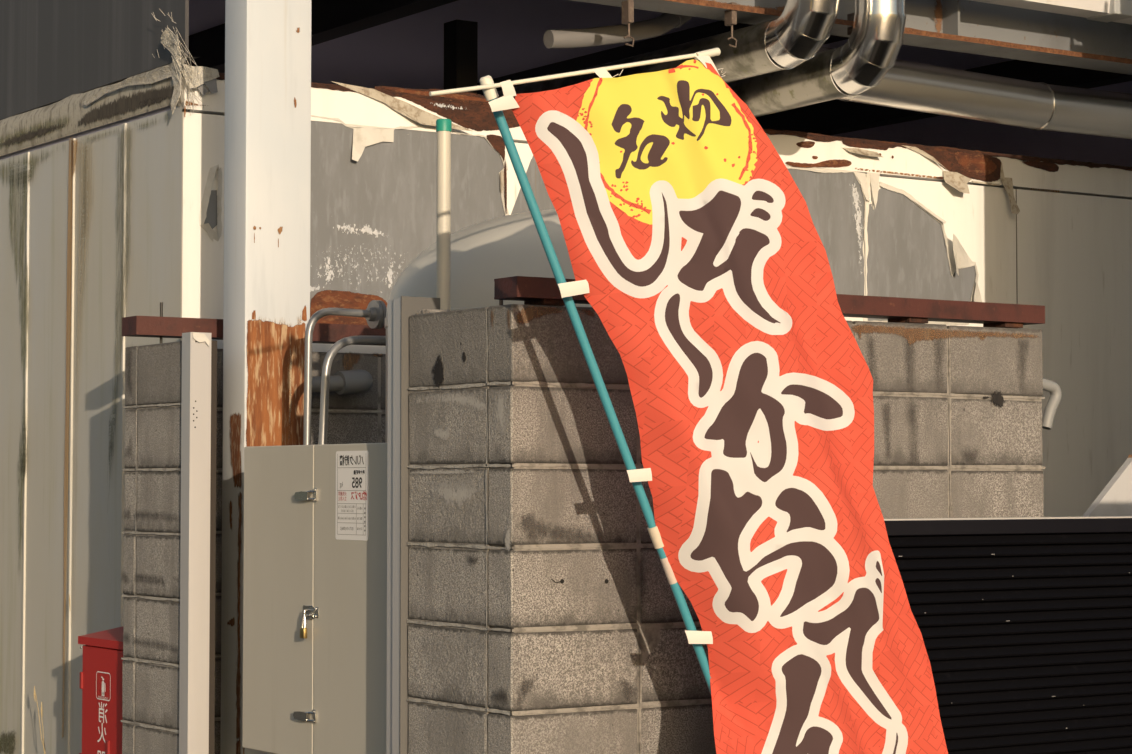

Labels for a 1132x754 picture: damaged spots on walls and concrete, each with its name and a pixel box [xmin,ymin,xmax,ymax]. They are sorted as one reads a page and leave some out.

damp [0,123,65,146]
damp [77,143,89,345]
damp [79,84,174,125]
peeling [199,164,222,241]
peeling [310,115,437,307]
peeling [451,131,555,234]
peeling [785,165,982,302]
rust [763,129,1132,214]
rust [62,138,77,737]
rust [227,290,387,754]